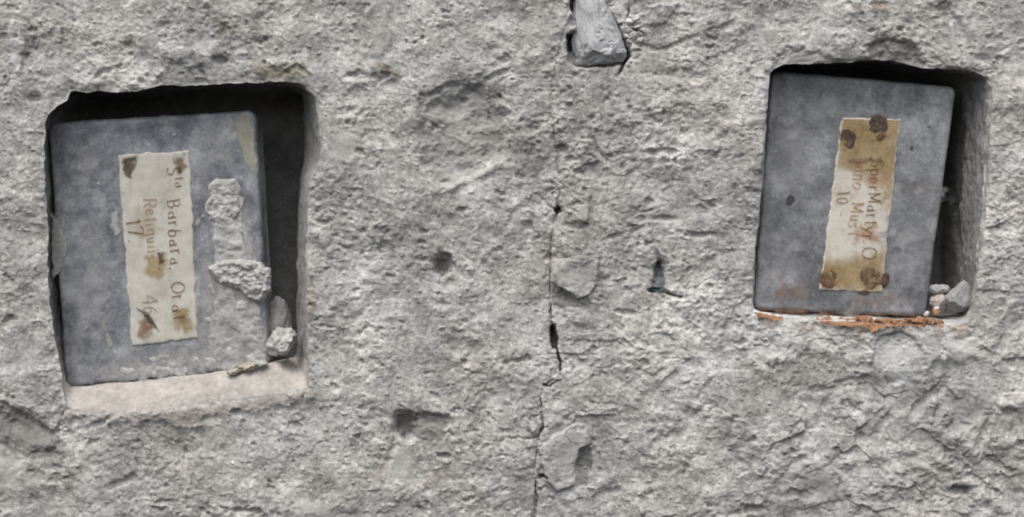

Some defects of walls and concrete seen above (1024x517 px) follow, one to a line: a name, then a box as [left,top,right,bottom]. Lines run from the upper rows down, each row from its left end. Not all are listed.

crack [513,269,562,506]
rust [816,315,944,333]